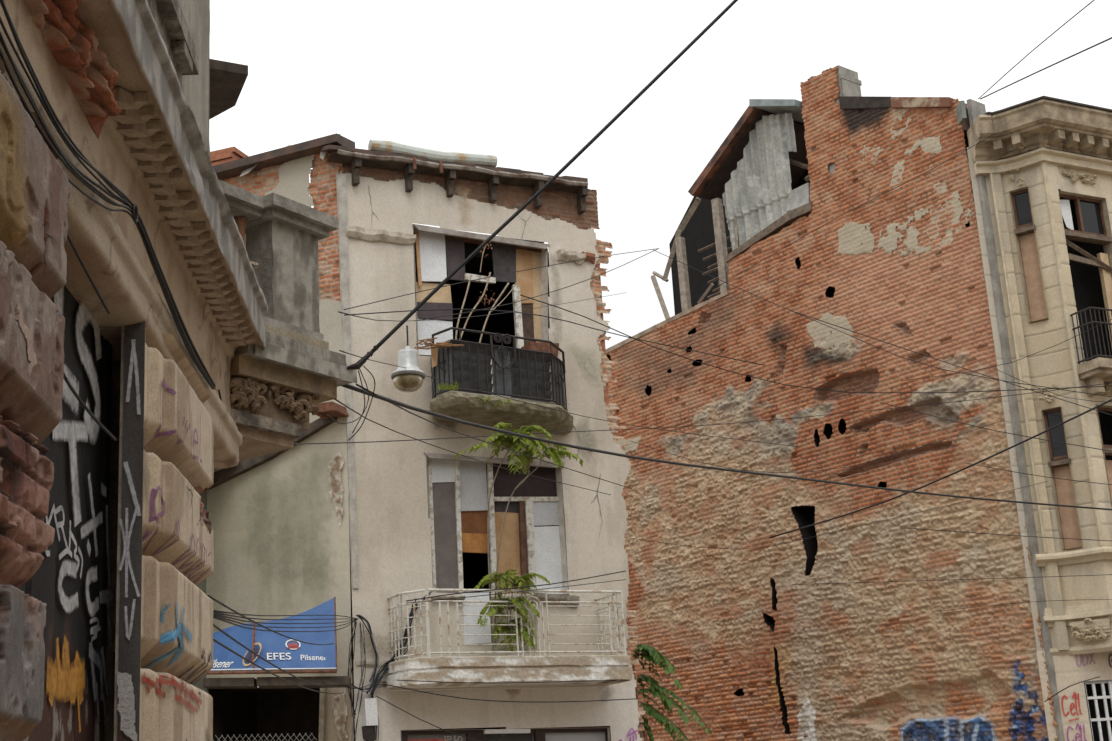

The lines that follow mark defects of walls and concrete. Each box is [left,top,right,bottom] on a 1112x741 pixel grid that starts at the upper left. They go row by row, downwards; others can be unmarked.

flaking render [308,151,626,449]
flaking render [15,304,37,376]
spalling [686,311,712,366]
spalling [893,321,913,337]
spalling [908,348,932,367]
spalling [813,368,880,403]
spalling [814,395,963,488]